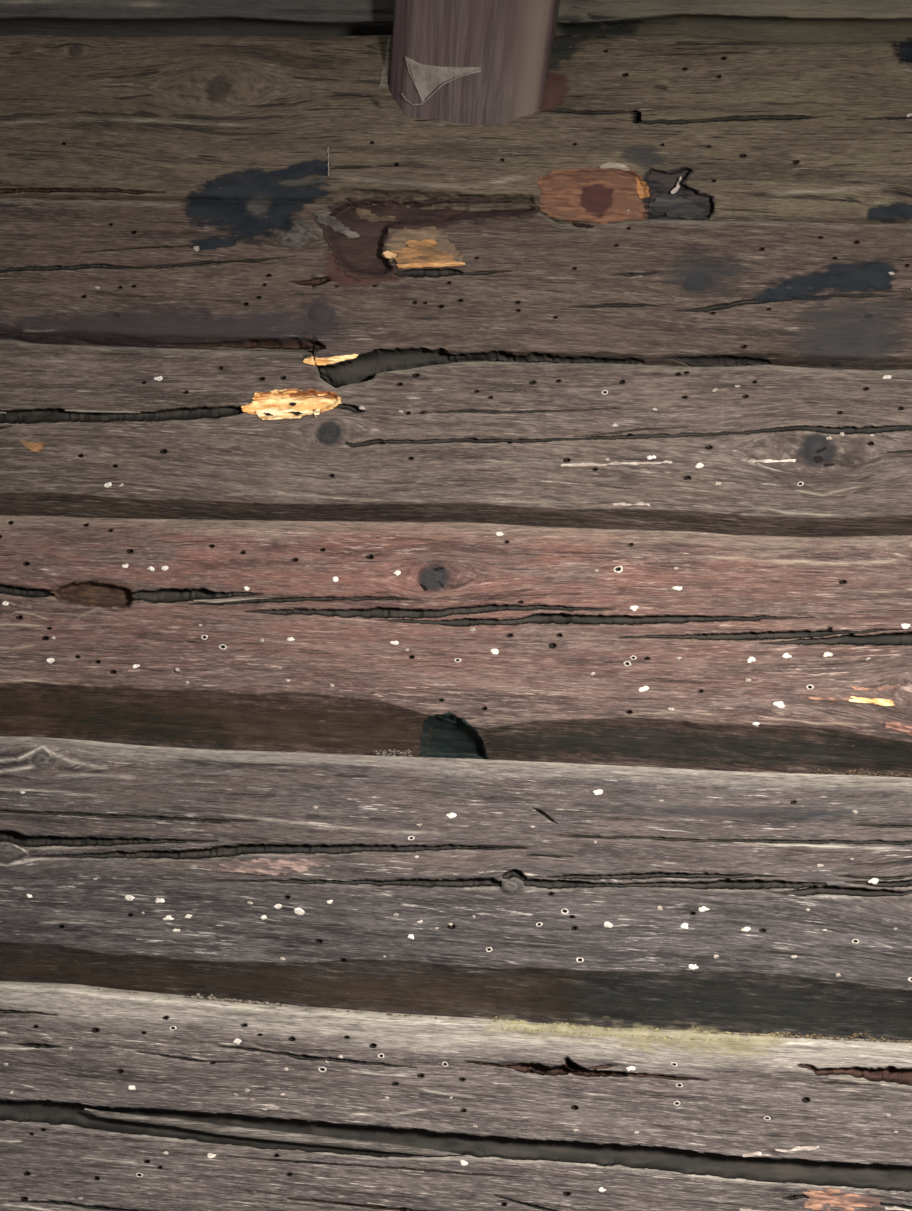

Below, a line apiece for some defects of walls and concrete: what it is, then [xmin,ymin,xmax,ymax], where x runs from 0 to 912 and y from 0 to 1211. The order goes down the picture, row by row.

peeling [600,161,650,198]
leakage [185,160,329,250]
peeling [381,239,465,269]
leakage [756,261,897,363]
crack [158,337,770,412]
peeling [255,389,338,418]
crack [346,408,912,454]
crack [0,584,55,597]
crack [132,589,912,645]
crack [0,808,912,896]
crack [468,1057,709,1081]
crack [798,1064,912,1085]